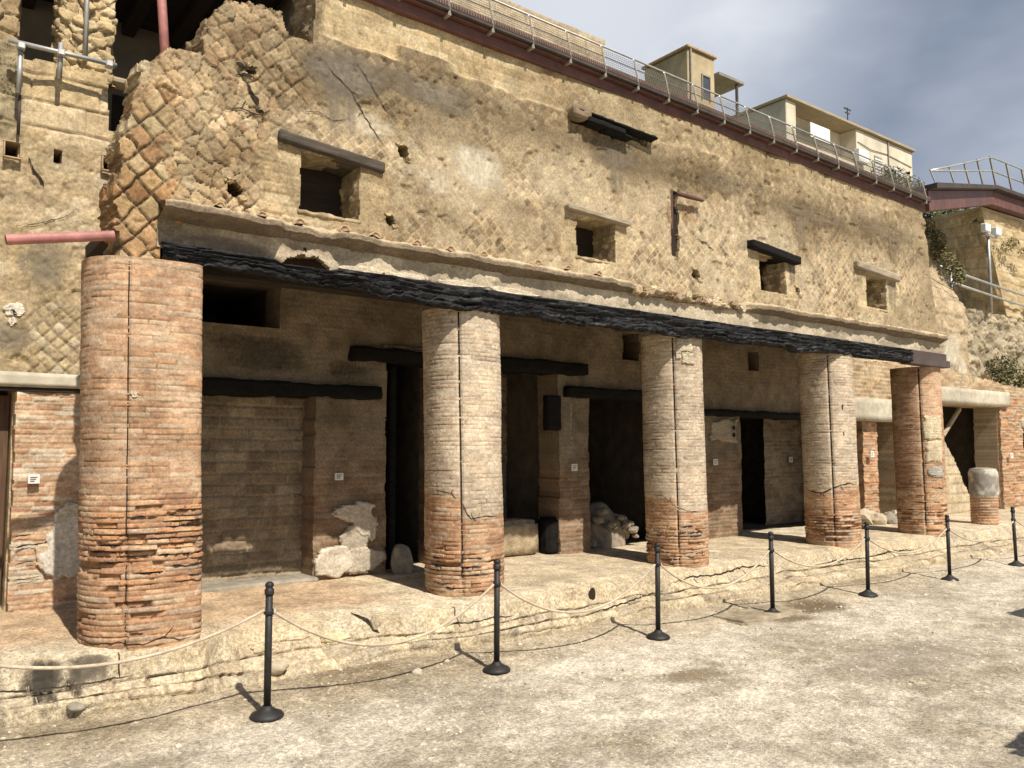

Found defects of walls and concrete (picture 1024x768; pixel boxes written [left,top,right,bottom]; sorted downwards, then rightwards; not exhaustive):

spalling [235,62,264,113]
crack [307,61,391,145]
crack [435,489,494,520]
crack [809,483,852,496]
flaking render [34,504,204,585]
crack [592,565,769,614]